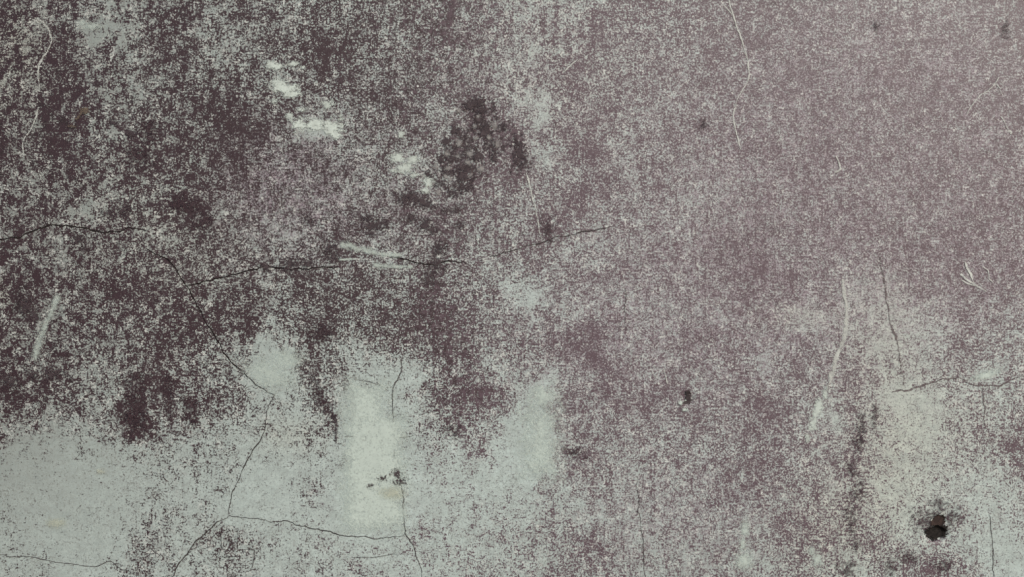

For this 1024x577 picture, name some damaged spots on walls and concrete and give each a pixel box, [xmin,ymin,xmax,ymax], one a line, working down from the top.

crack [387,226,613,265]
crack [0,224,422,577]
peeling [339,377,407,534]
crack [879,257,1019,428]